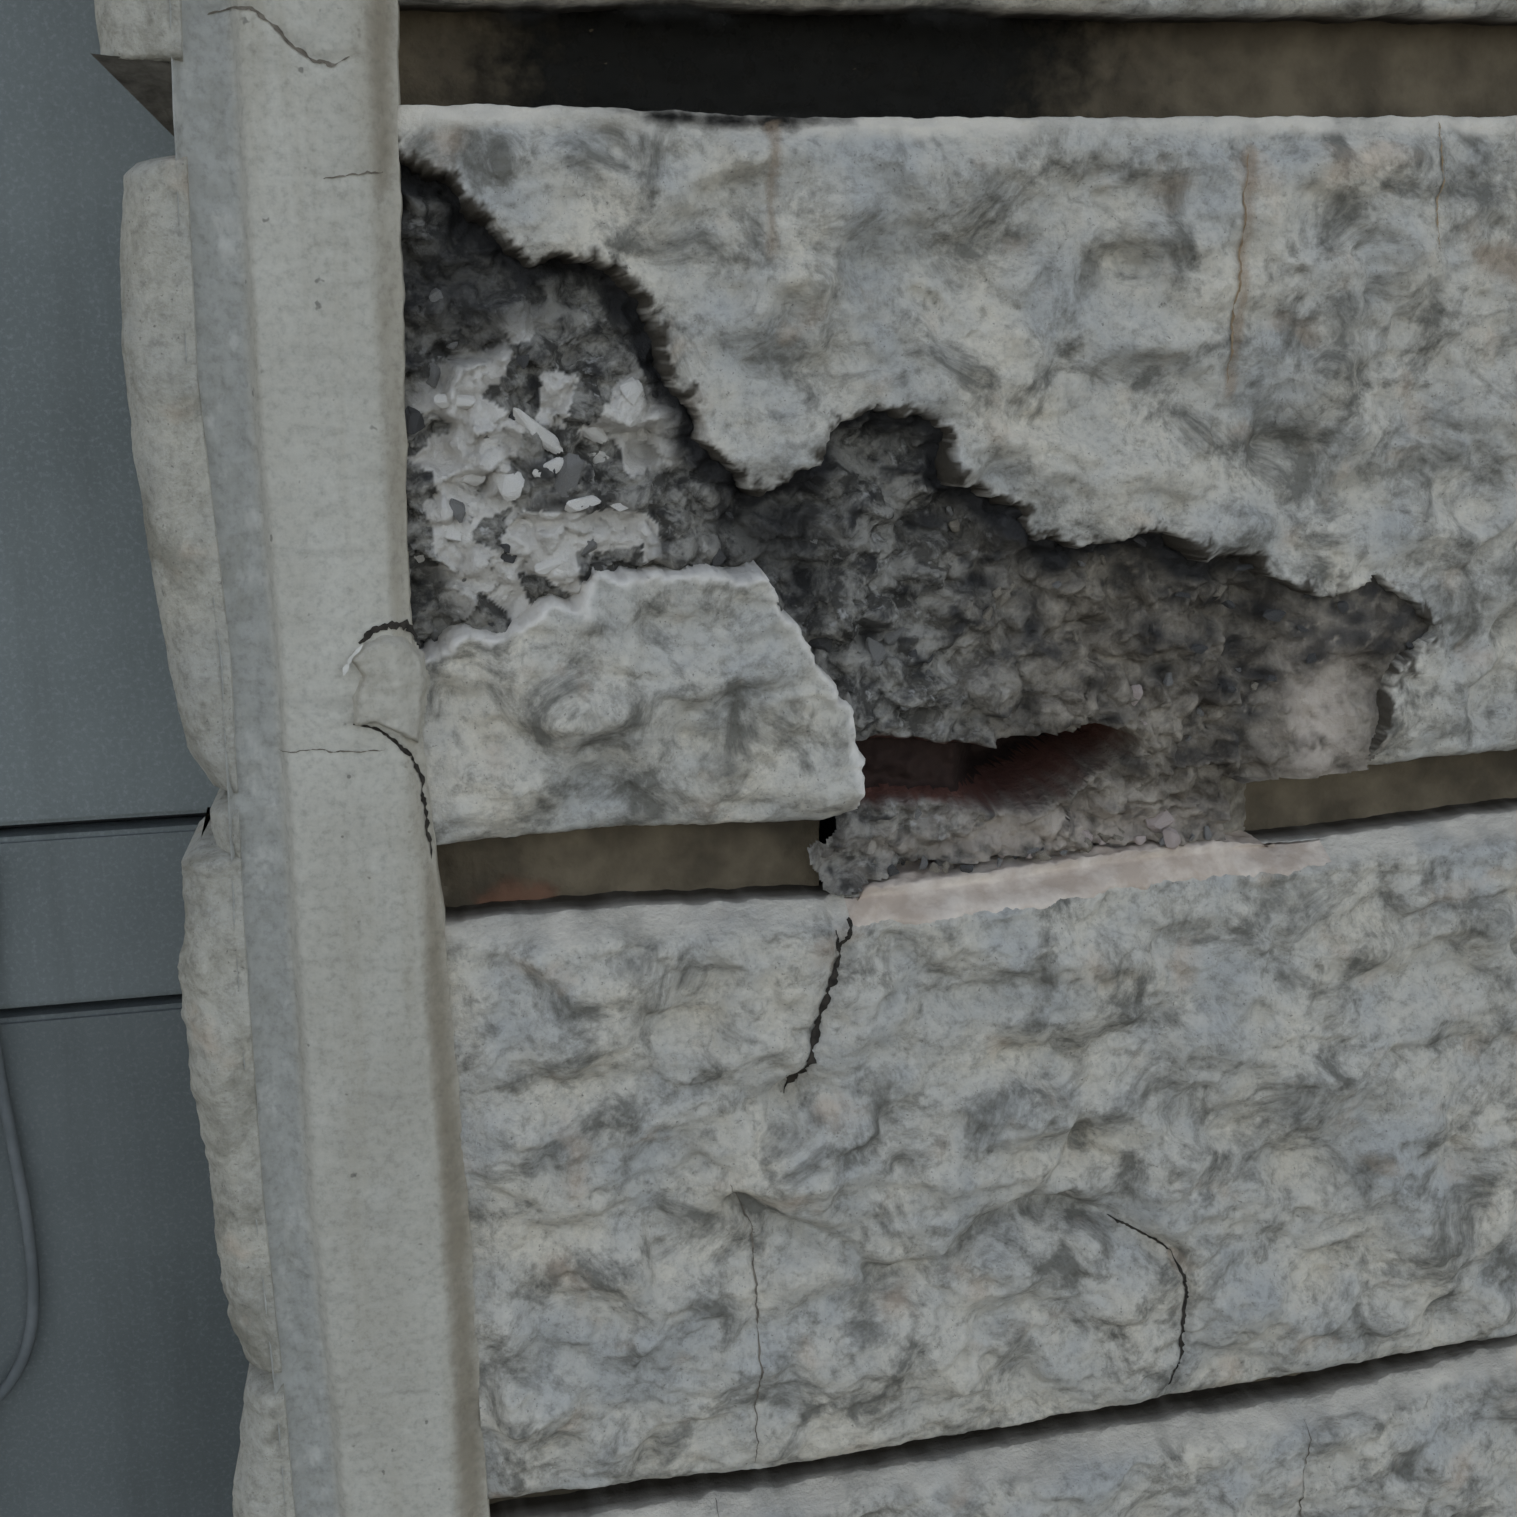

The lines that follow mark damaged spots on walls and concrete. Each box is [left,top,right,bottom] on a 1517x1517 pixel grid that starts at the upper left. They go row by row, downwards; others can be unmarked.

crack [208,6,350,67]
spalling [343,165,1429,927]
crack [279,724,432,859]
crack [784,917,853,1089]
crack [1107,1214,1189,1385]